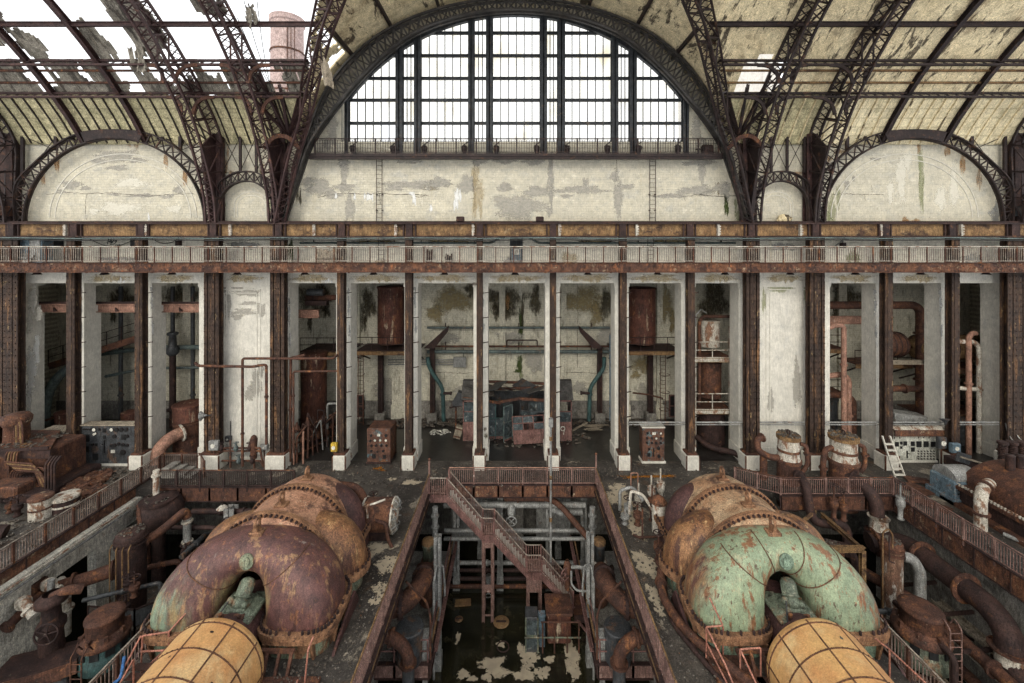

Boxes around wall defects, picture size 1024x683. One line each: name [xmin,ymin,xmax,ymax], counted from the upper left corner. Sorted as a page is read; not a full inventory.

peeling [378,160,634,221]
water stain [357,275,396,331]
water stain [489,275,541,321]